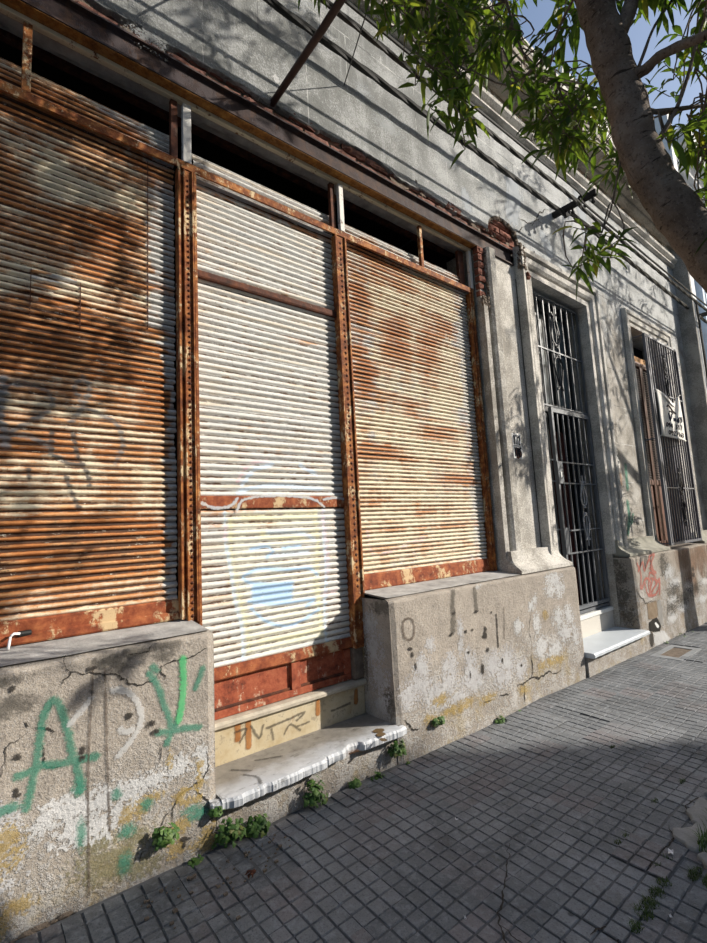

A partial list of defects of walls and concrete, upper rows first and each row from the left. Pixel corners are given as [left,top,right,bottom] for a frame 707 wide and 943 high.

crack [485,617,561,703]
crack [0,647,206,778]
rust [235,720,252,750]